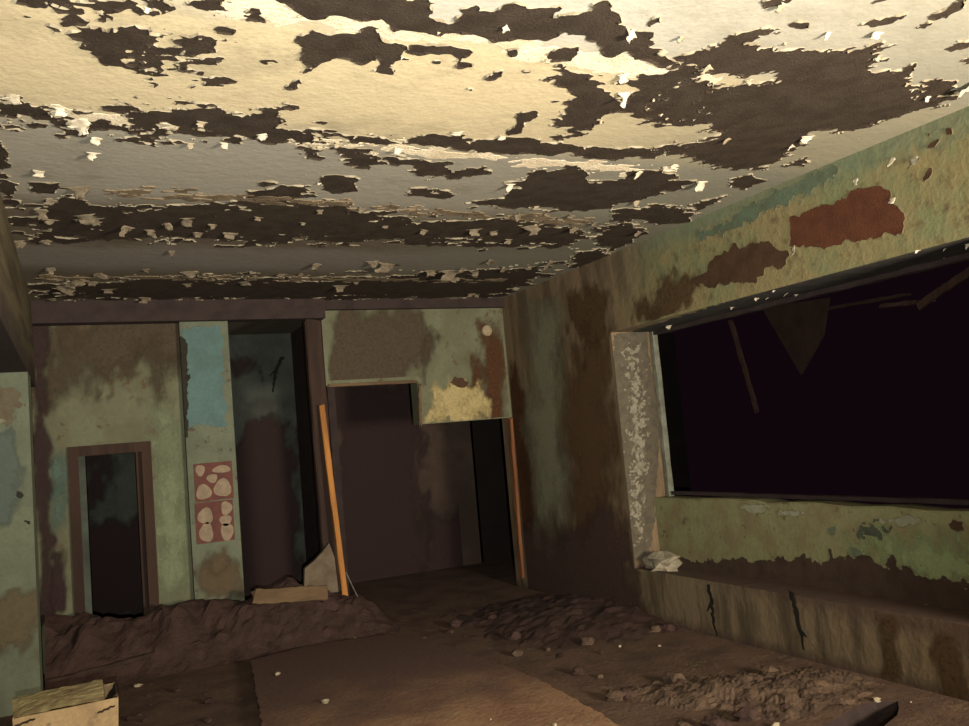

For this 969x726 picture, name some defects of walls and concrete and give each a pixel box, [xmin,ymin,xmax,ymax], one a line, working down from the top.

peeling [0,0,969,561]
crack [707,584,717,636]
crack [789,591,807,650]
peeling [679,514,969,612]